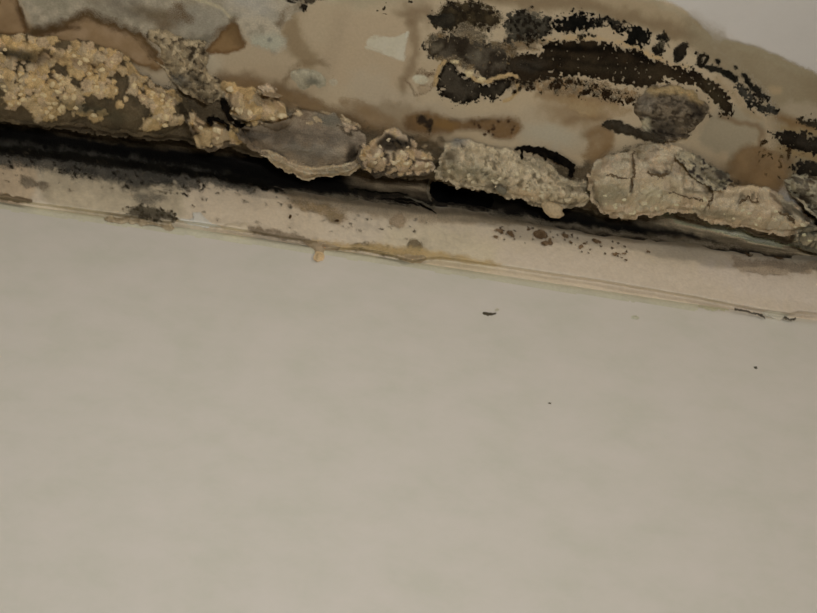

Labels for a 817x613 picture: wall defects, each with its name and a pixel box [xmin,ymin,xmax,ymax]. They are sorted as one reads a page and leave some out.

spalling [0,28,305,158]
water stain [0,0,817,204]
water stain [0,135,817,280]
spalling [337,116,817,254]